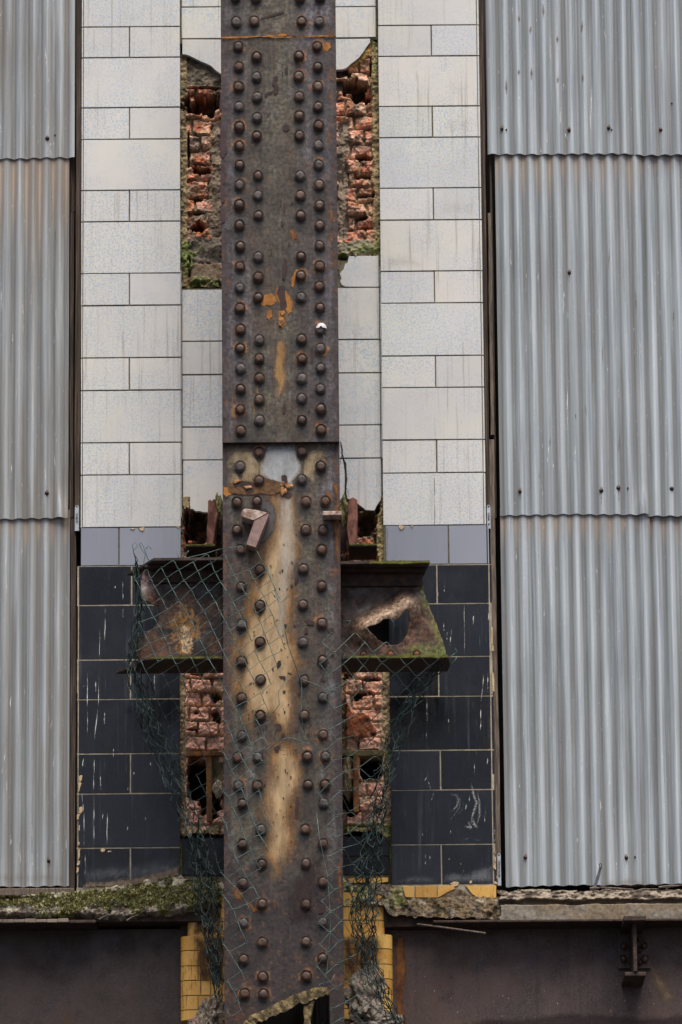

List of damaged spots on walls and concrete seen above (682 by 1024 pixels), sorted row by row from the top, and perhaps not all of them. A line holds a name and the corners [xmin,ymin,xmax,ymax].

rust [221,34,334,51]
spalling [180,54,227,289]
spalling [336,40,380,270]
rust [260,269,298,328]
rust [275,341,286,396]
spalling [177,497,221,558]
spalling [341,495,384,561]
spalling [180,673,224,837]
rust [233,497,300,869]
spalling [341,672,391,841]